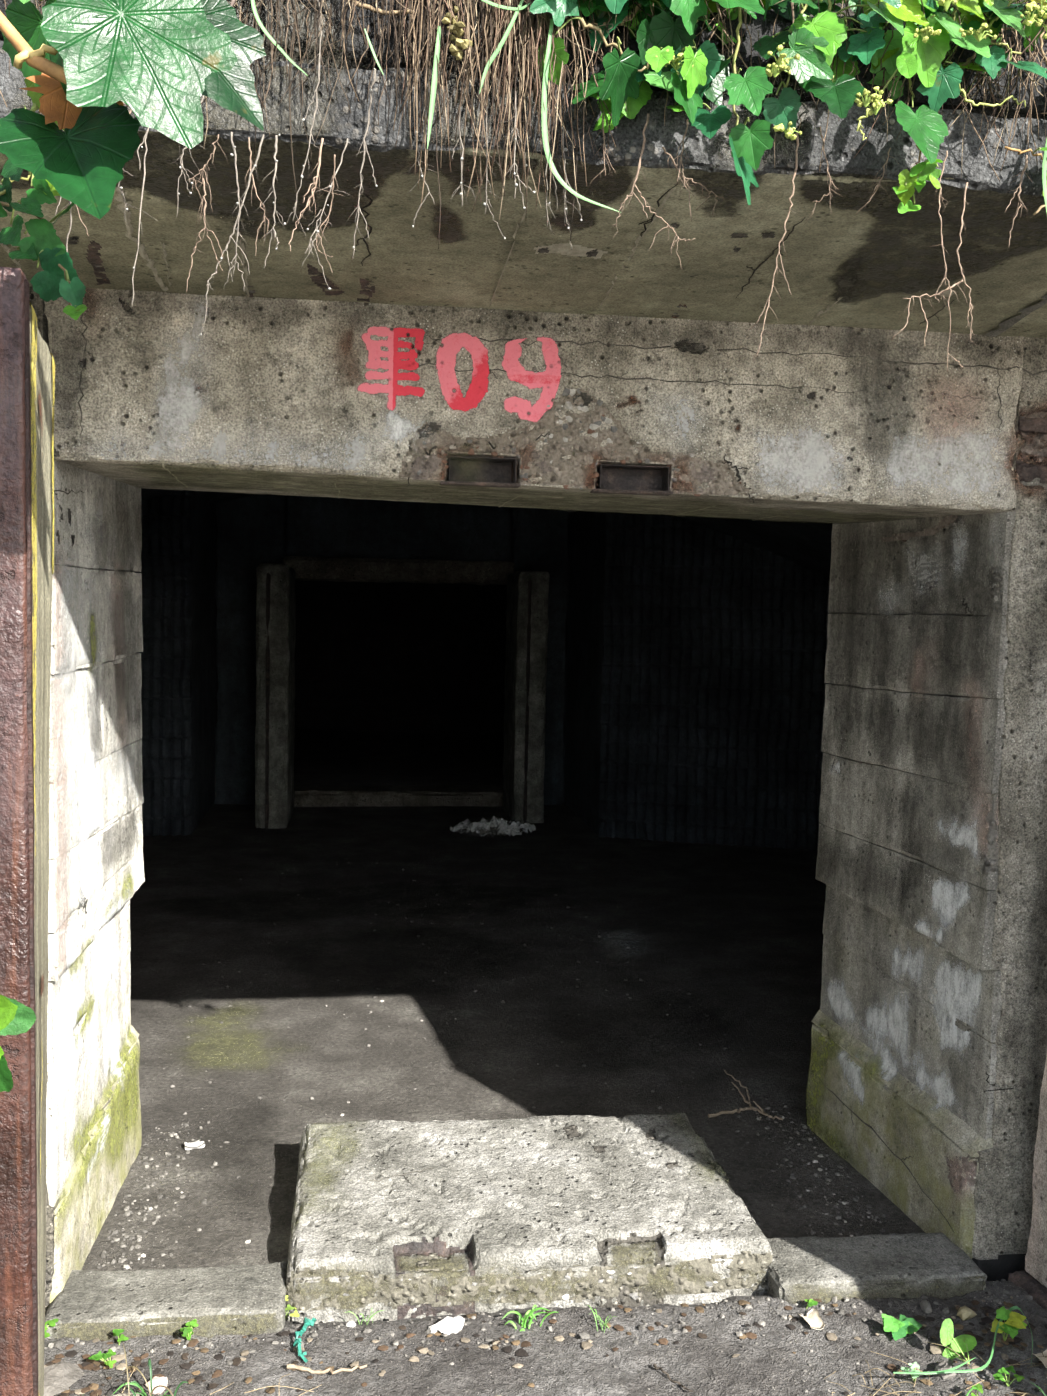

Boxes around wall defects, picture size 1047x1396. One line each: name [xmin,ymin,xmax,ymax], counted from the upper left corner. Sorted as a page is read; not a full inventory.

leakage [0,168,33,189]
leakage [17,77,58,126]
crack [355,196,373,266]
leakage [116,0,632,243]
leakage [684,77,811,217]
crack [735,218,805,299]
leakage [800,173,1047,305]
efflorescence [940,822,977,855]
efflorescence [893,880,981,1049]
leakage [49,897,129,1186]
efflorescence [828,981,954,1106]